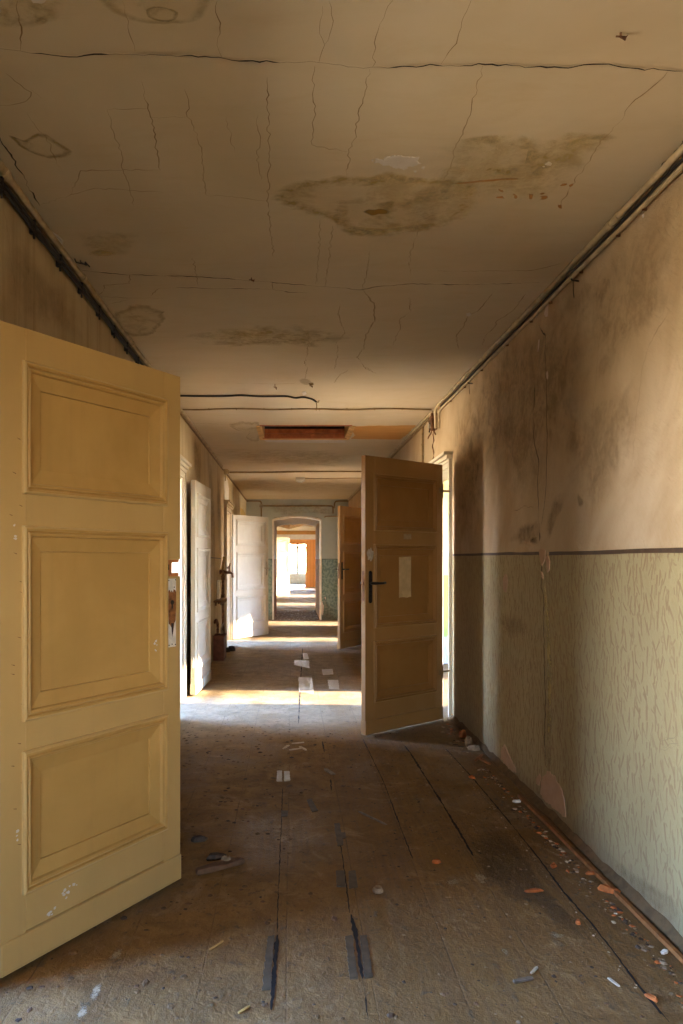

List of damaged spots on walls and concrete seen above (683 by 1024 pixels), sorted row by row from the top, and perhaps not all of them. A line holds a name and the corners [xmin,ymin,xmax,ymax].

crack [0,0,675,255]
crack [84,225,540,385]
spalling [536,771,566,817]